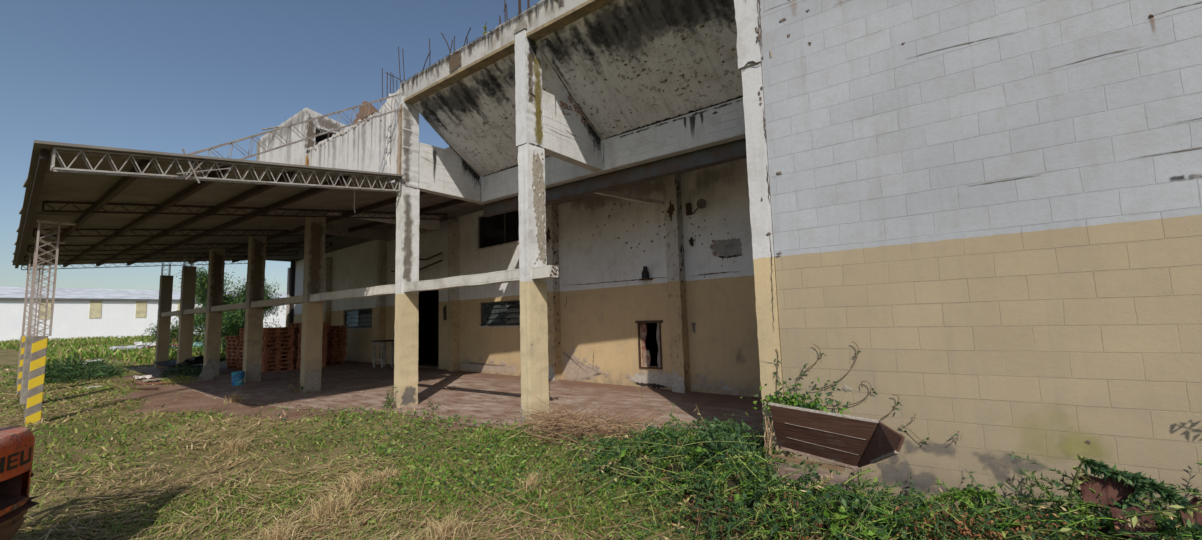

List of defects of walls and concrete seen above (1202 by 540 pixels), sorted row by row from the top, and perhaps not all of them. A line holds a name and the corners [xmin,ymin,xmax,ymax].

leakage [401,0,739,144]
crack [907,32,1014,59]
crack [1051,46,1143,69]
leakage [584,118,601,150]
crack [1129,117,1202,159]
leakage [462,160,480,183]
flaking render [593,180,743,297]
peeling [531,149,610,381]
peeling [626,365,687,393]
leakage [878,442,954,492]